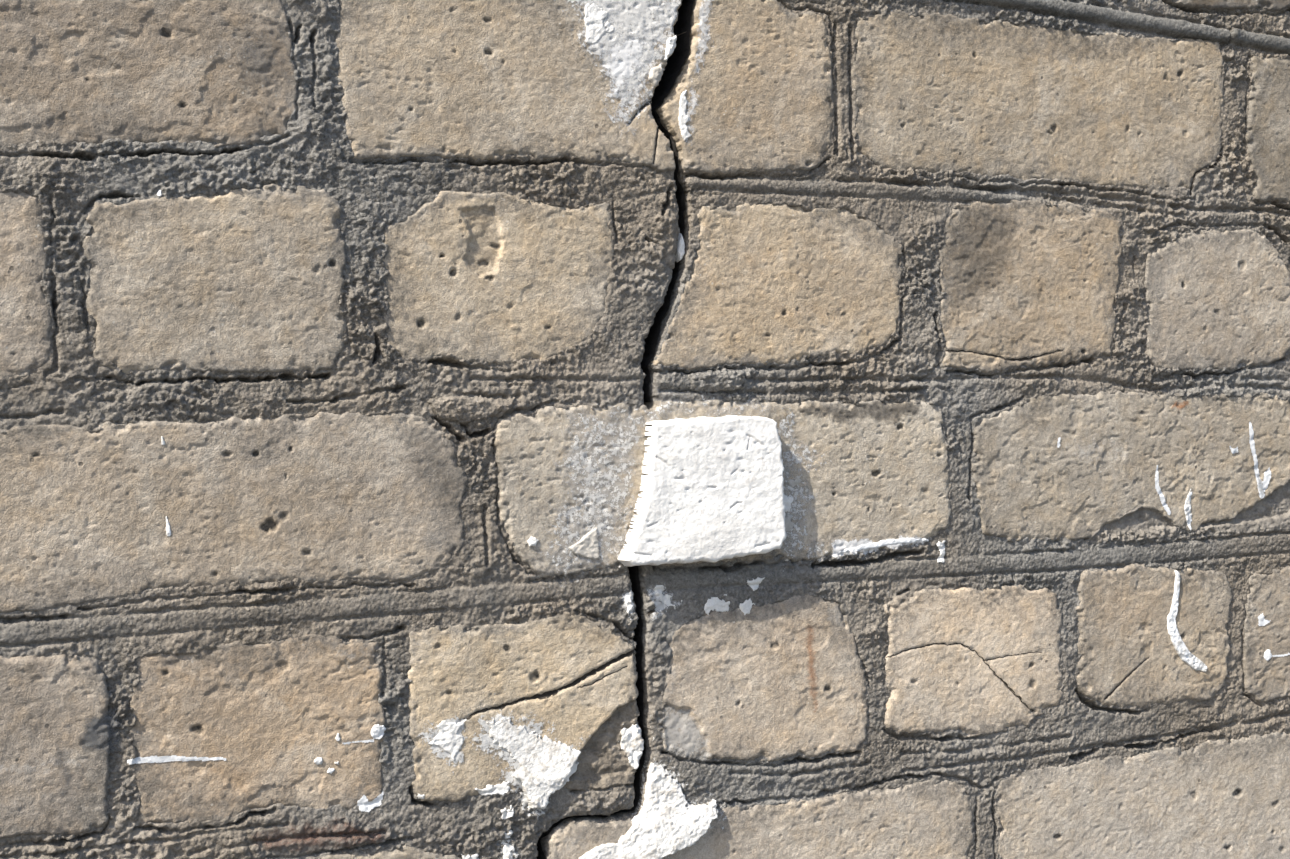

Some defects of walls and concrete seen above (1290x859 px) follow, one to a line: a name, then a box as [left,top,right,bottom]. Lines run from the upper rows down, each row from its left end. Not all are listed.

peeling [584,3,677,100]
crack [628,0,694,402]
crack [460,566,655,859]
flaking render [419,698,727,859]